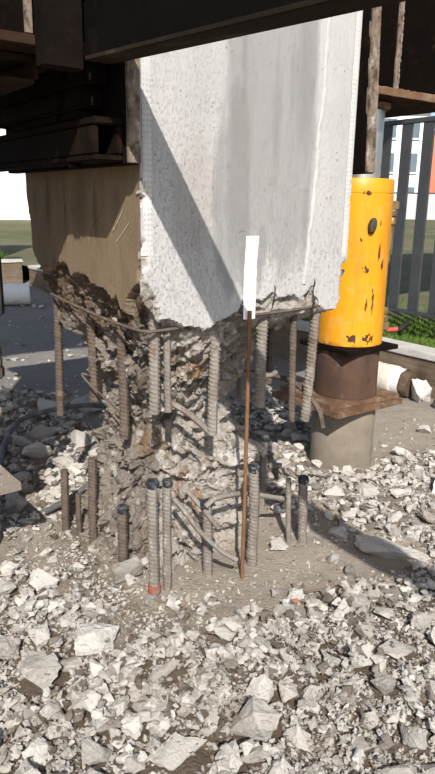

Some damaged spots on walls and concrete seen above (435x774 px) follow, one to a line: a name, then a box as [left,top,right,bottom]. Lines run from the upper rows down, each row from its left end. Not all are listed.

spalling [37,17,352,436]
spalling [60,457,98,544]
spalling [145,434,309,597]